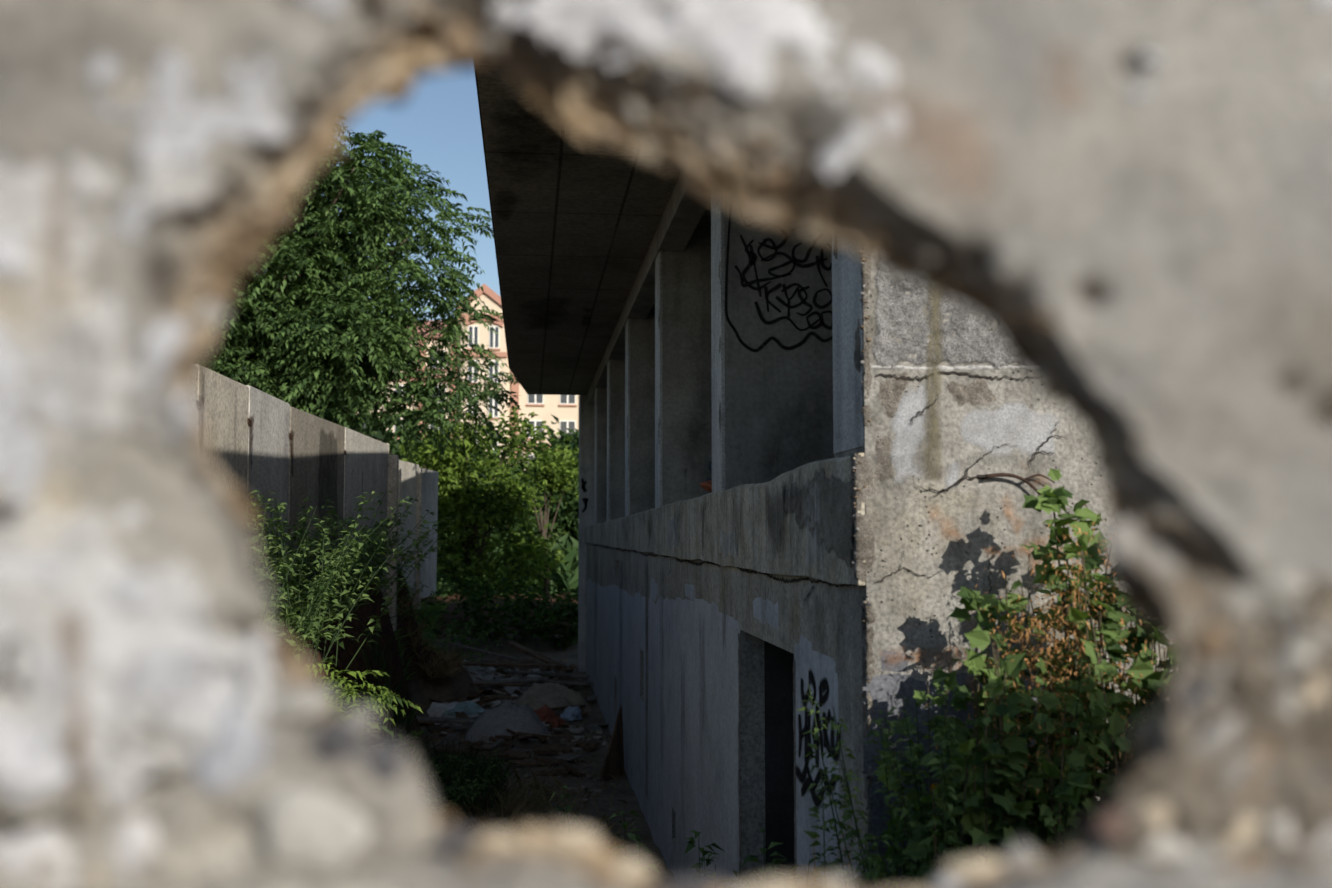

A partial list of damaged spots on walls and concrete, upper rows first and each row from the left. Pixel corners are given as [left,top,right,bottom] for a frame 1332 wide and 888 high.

peeling [442,0,894,166]
spalling [1079,280,1110,305]
spalling [0,49,520,888]
peeling [545,104,1071,888]
crack [914,421,1068,498]